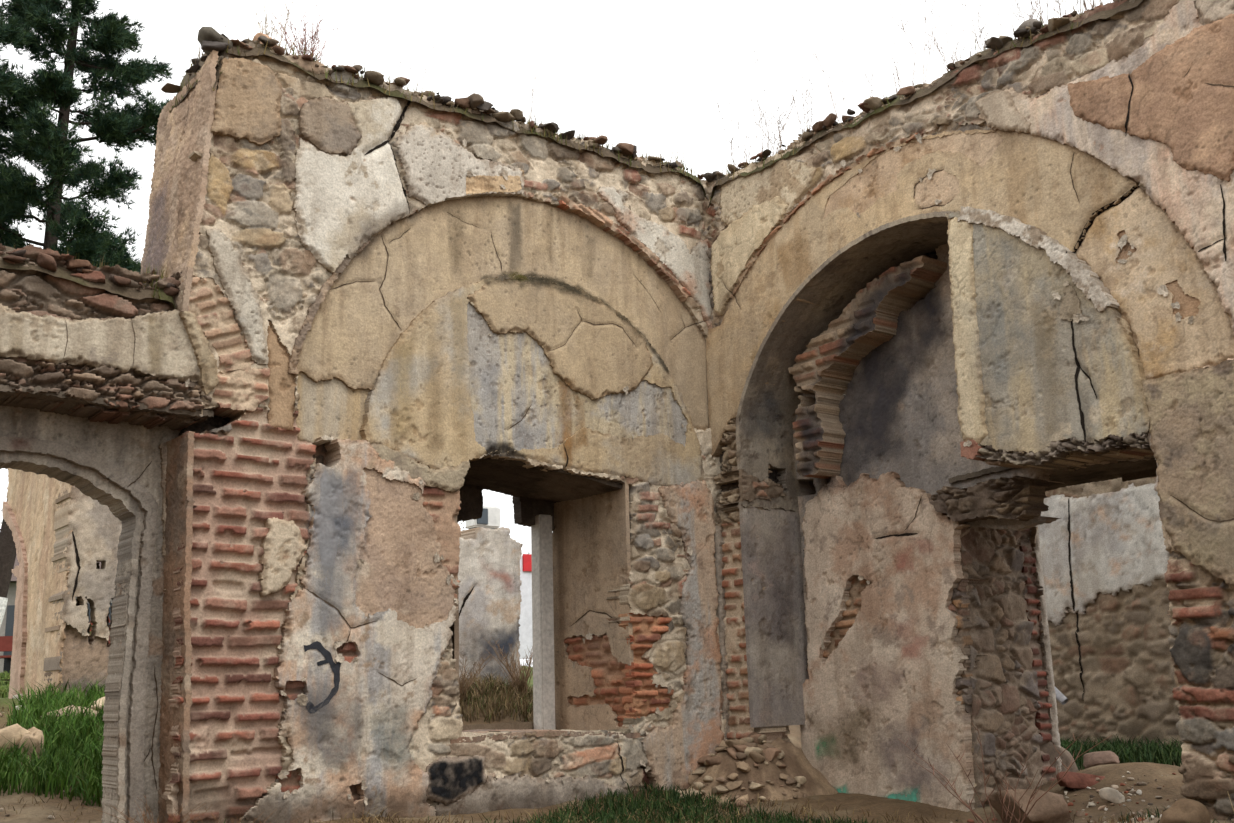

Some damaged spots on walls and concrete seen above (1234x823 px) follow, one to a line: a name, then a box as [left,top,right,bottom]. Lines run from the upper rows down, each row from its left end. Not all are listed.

spalling [782,0,1179,219]
spalling [188,46,728,356]
peeling [1116,231,1137,264]
crack [549,310,636,351]
crack [635,276,741,340]
peeling [1157,280,1201,324]
crack [1070,319,1097,443]
spalling [415,482,693,789]
spalling [821,576,871,659]
spalling [279,677,308,706]
spalling [1164,559,1234,822]
spalling [276,769,301,799]